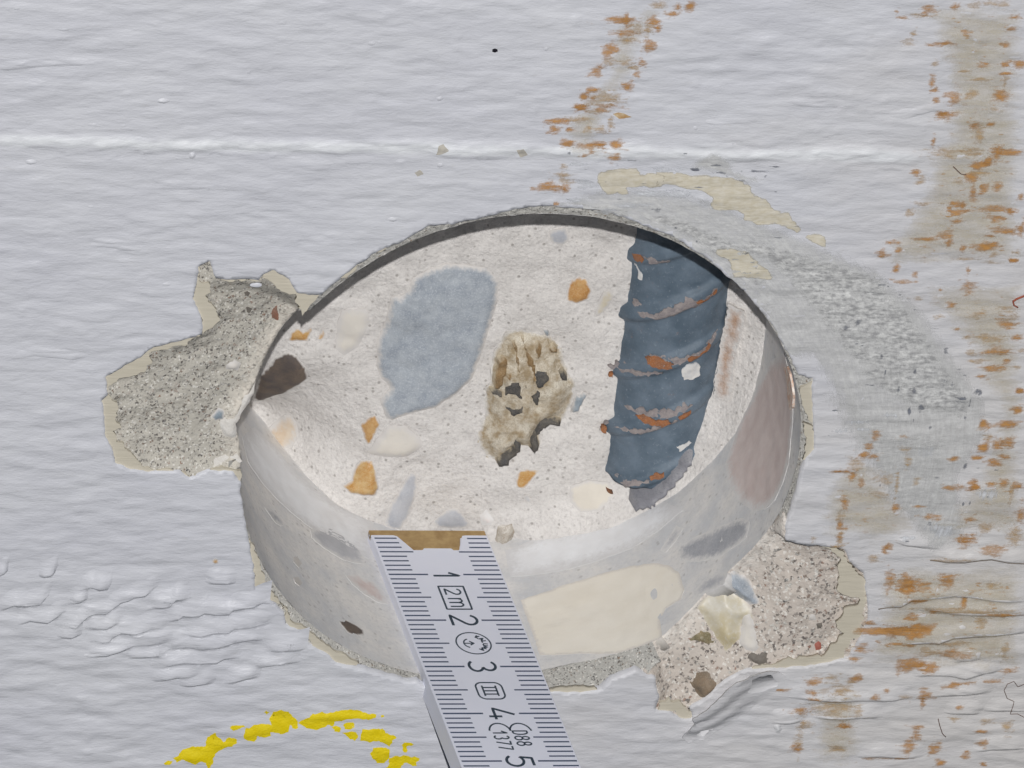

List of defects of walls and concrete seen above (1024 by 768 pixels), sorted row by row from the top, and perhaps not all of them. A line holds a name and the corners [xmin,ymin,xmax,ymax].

corrosion [603,14,634,55]
corrosion [622,3,694,90]
corrosion [930,5,1024,118]
corrosion [546,89,621,160]
corrosion [920,118,1023,271]
spalling [102,206,718,481]
corrosion [635,410,691,427]
corrosion [972,407,1022,466]
spalling [244,516,421,680]
spalling [542,307,868,743]
corrosion [857,574,1013,672]
crack [930,558,1024,566]